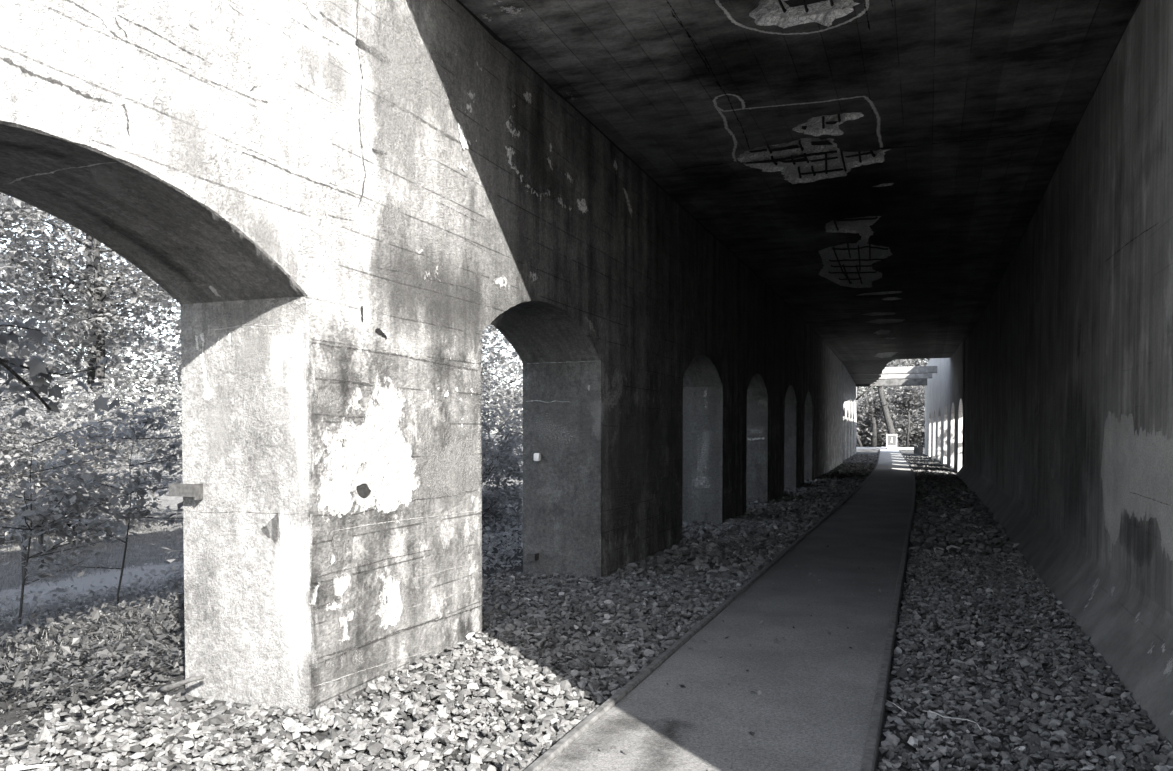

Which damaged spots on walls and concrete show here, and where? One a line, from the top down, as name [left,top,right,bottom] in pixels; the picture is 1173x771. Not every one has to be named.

spalling [749,0,860,28]
crack [0,57,135,151]
crack [242,0,461,220]
peeling [505,91,587,213]
crack [456,0,840,360]
spalling [737,112,891,184]
spalling [818,216,904,335]
peeling [309,373,481,668]
peeling [1101,409,1173,561]